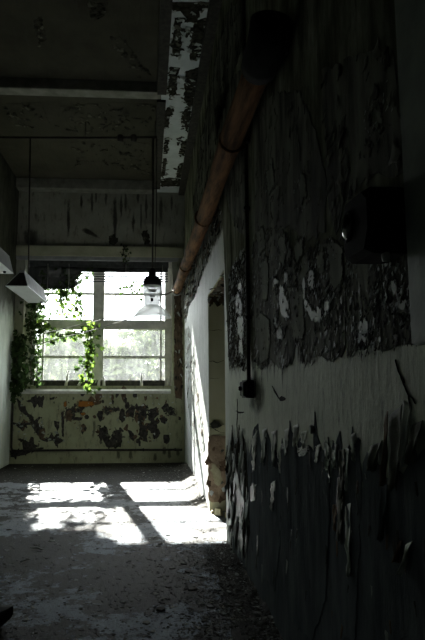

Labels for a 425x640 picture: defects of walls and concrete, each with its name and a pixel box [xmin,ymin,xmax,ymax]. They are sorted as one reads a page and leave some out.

peeling [160,1,209,188]
peeling [207,222,417,374]
peeling [10,206,367,640]